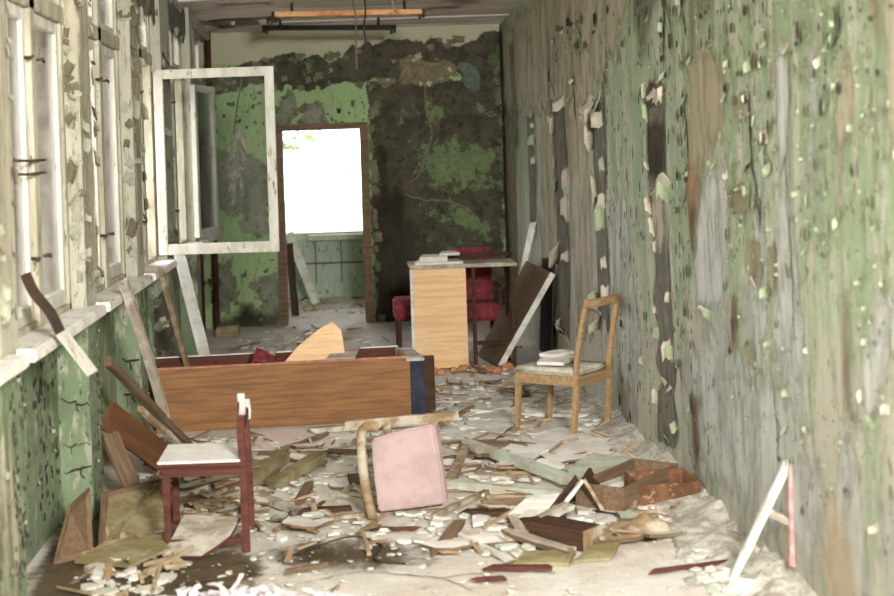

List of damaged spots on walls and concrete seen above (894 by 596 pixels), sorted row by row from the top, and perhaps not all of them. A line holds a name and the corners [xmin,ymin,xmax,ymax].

peeling [0,0,22,330]
peeling [62,0,105,292]
peeling [117,0,155,261]
peeling [161,51,179,244]
peeling [168,0,285,43]
leakage [376,149,408,321]
peeling [203,0,894,596]